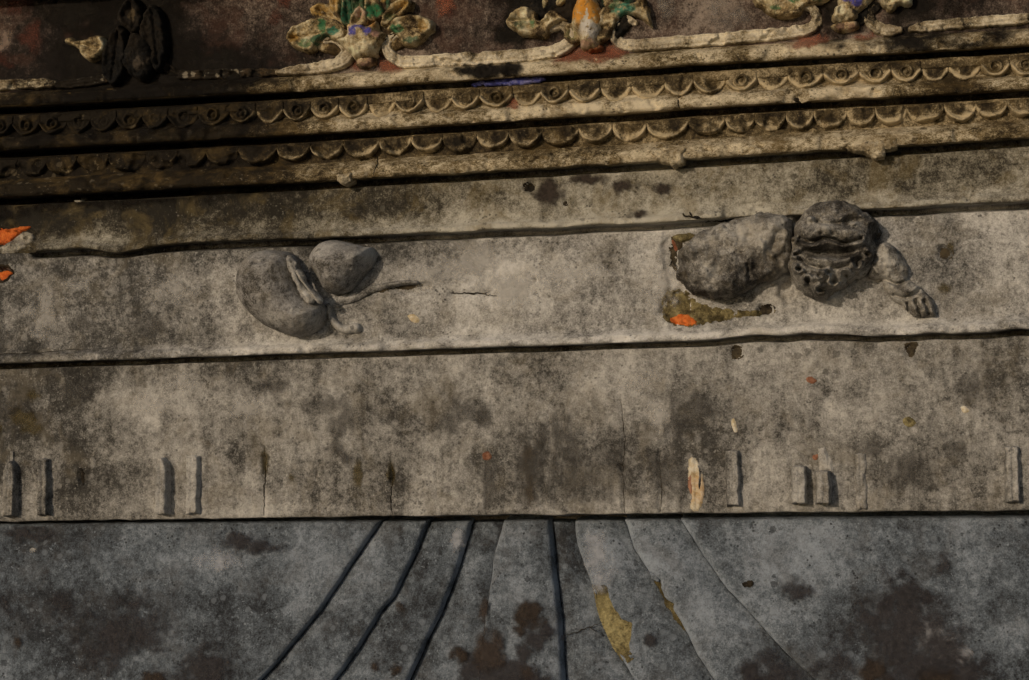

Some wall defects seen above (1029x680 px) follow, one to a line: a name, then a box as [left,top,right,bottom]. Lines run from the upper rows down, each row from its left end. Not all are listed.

spalling [0,226,35,283]
spalling [592,585,634,663]
water stain [644,635,656,647]
spalling [649,572,686,631]
water stain [736,567,990,680]